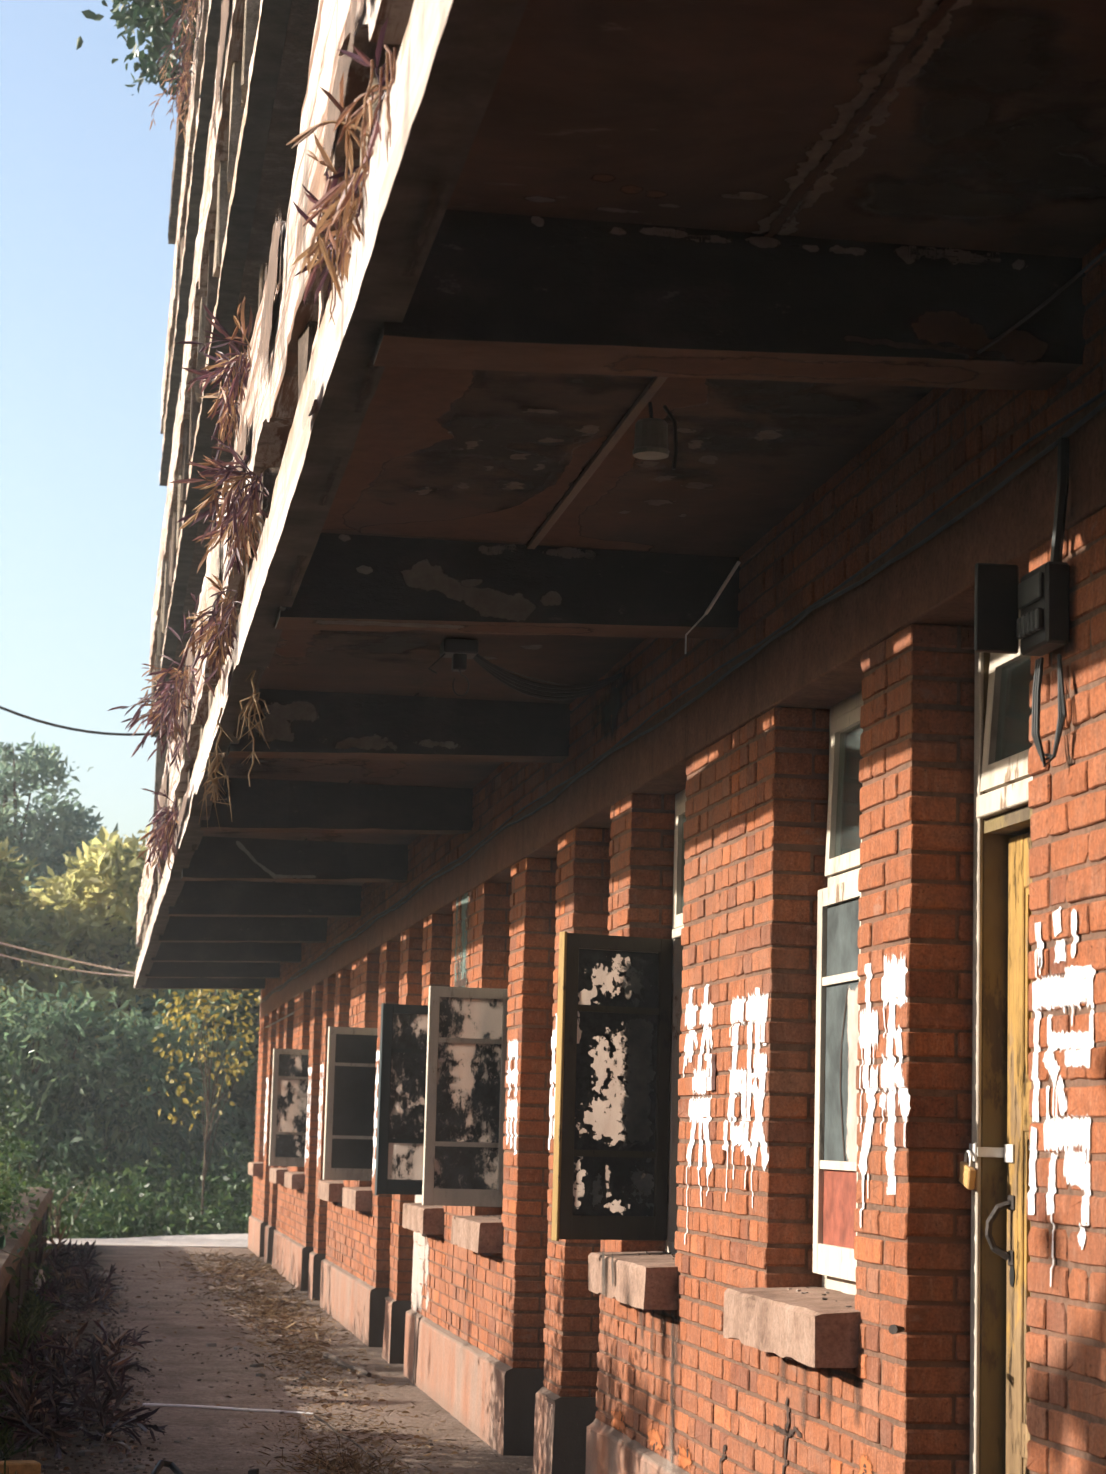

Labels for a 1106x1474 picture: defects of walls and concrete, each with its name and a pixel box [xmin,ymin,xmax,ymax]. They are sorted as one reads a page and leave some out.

spalling [314,557,562,629]